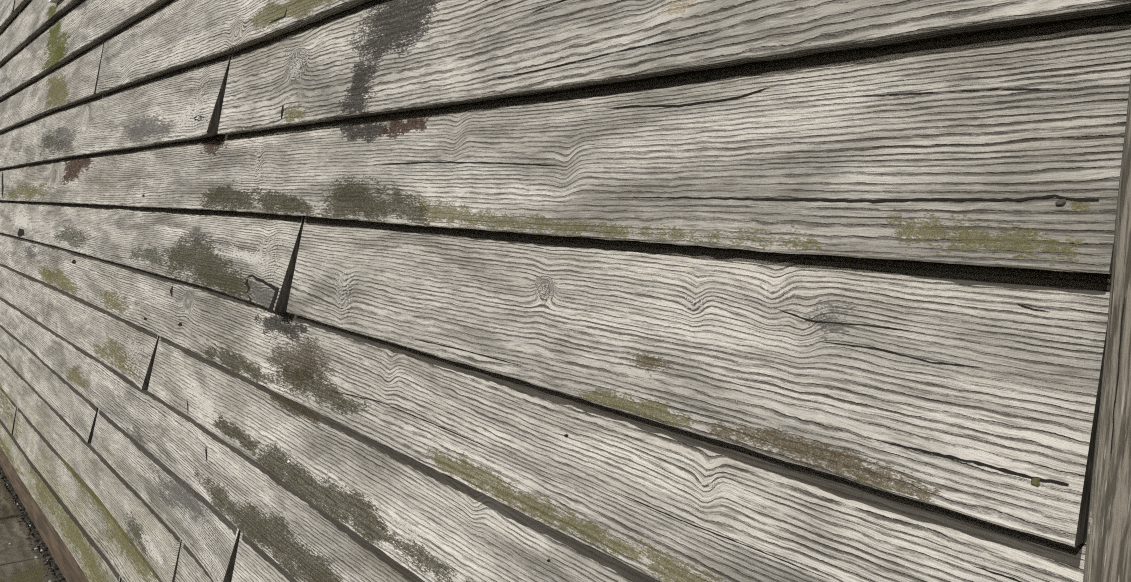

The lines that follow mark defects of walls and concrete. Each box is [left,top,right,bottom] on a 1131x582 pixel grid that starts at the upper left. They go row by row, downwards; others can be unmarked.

leakage [336,0,441,144]
leakage [254,313,309,341]